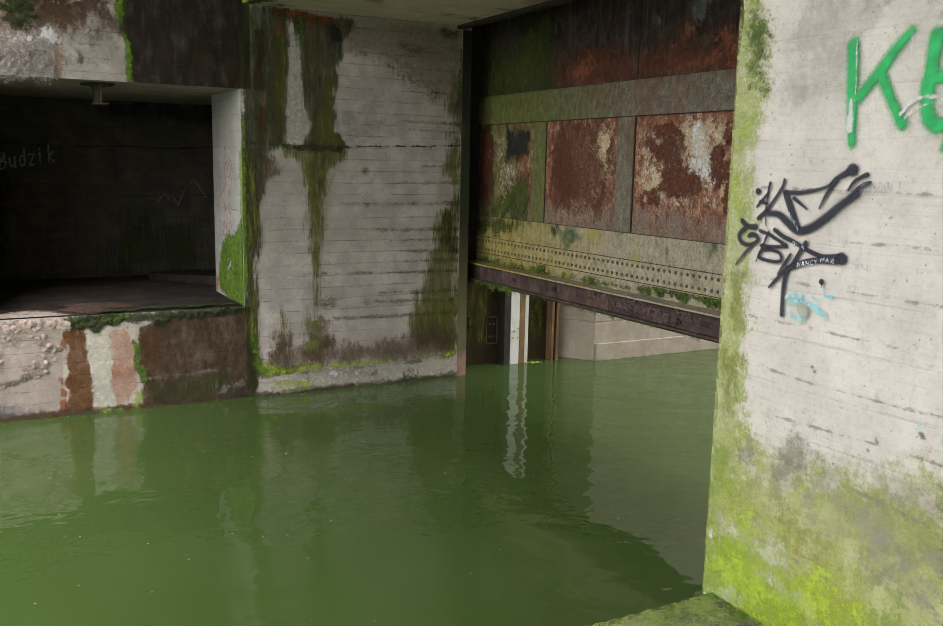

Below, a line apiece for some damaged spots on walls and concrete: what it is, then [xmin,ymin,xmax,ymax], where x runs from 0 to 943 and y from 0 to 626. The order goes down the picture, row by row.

leakage [12,25,63,46]
leakage [286,34,305,141]
corrosion [640,8,740,78]
corrosion [478,125,496,213]
corrosion [547,120,615,216]
corrosion [640,111,735,217]
corrosion [59,328,94,413]
leakage [0,309,457,423]
leakage [709,505,830,601]